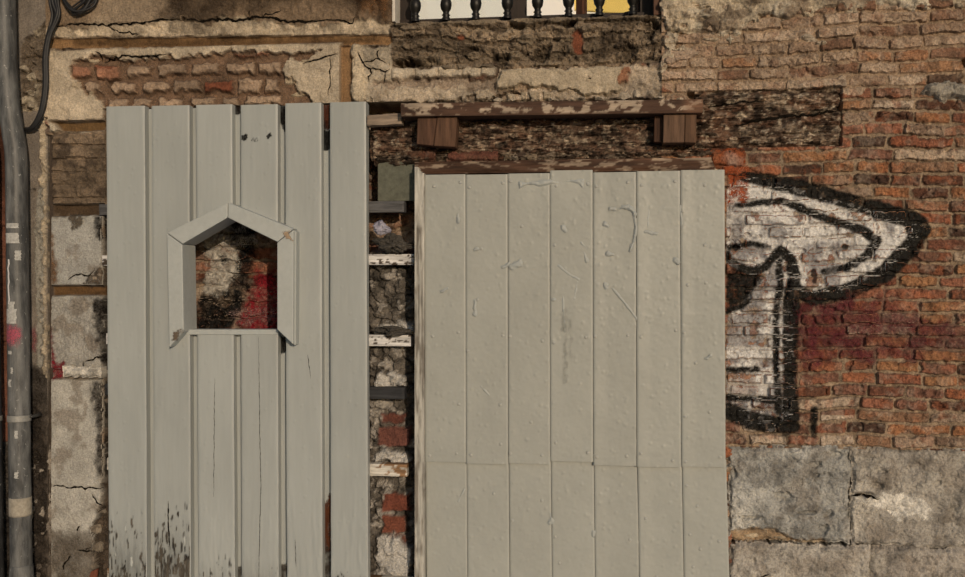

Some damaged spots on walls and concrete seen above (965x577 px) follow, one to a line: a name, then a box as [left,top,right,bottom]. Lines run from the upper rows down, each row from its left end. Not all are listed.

crack [57,1,356,62]
flaking render [71,51,312,108]
crack [52,485,103,505]